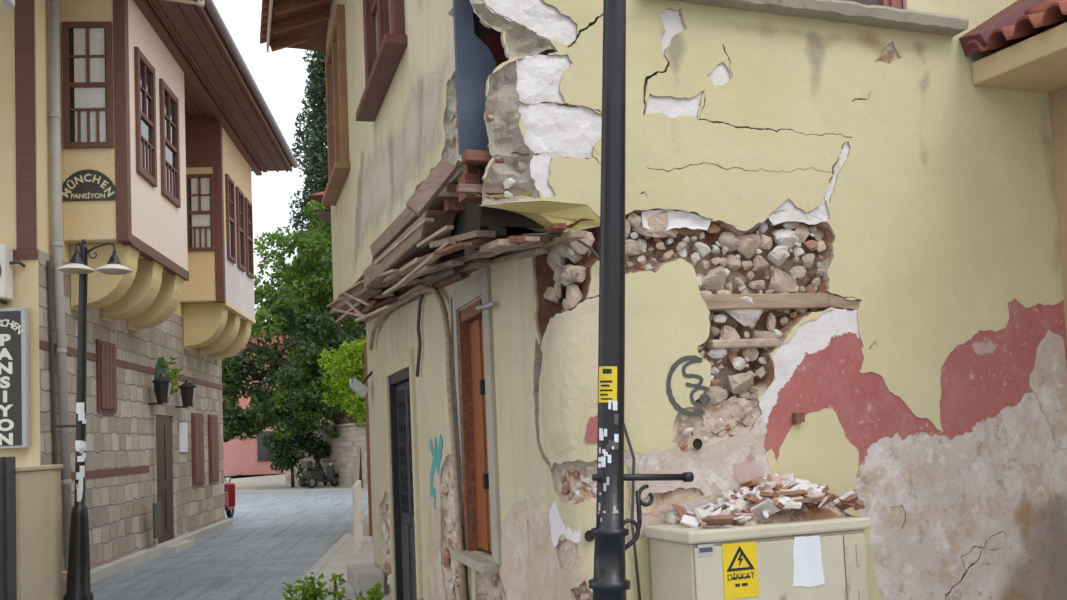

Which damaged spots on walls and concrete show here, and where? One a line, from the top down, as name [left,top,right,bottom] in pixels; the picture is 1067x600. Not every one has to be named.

crack [569,15,603,47]
peeling [660,9,685,58]
peeling [707,63,730,85]
spalling [470,0,602,205]
peeling [646,91,703,118]
flaking render [535,218,600,340]
peeling [624,142,1067,600]
peeling [584,415,598,444]
peeling [426,451,597,600]